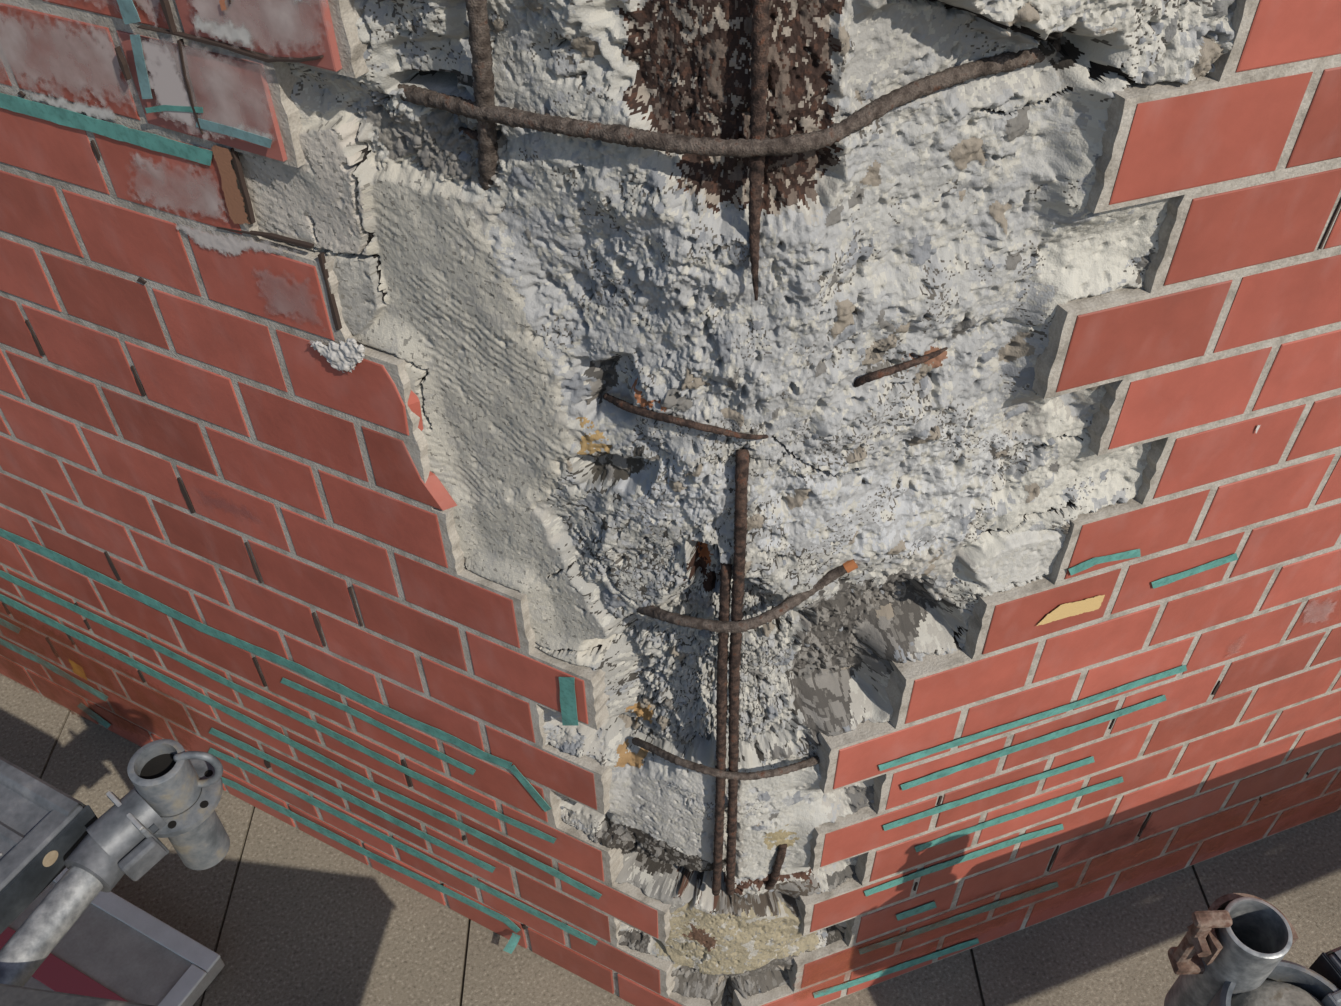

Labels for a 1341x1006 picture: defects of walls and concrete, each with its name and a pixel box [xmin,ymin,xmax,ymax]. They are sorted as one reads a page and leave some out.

efflorescence [0,14,124,120]
efflorescence [135,0,272,139]
efflorescence [193,0,311,49]
corrosion [619,0,845,140]
crack [929,0,1138,116]
efflorescence [176,186,295,256]
crack [114,0,387,331]
corrosion [665,143,844,216]
peeling [238,0,1237,918]
spalling [618,924,658,957]
corrosion [674,867,813,913]
spalling [671,924,847,1006]